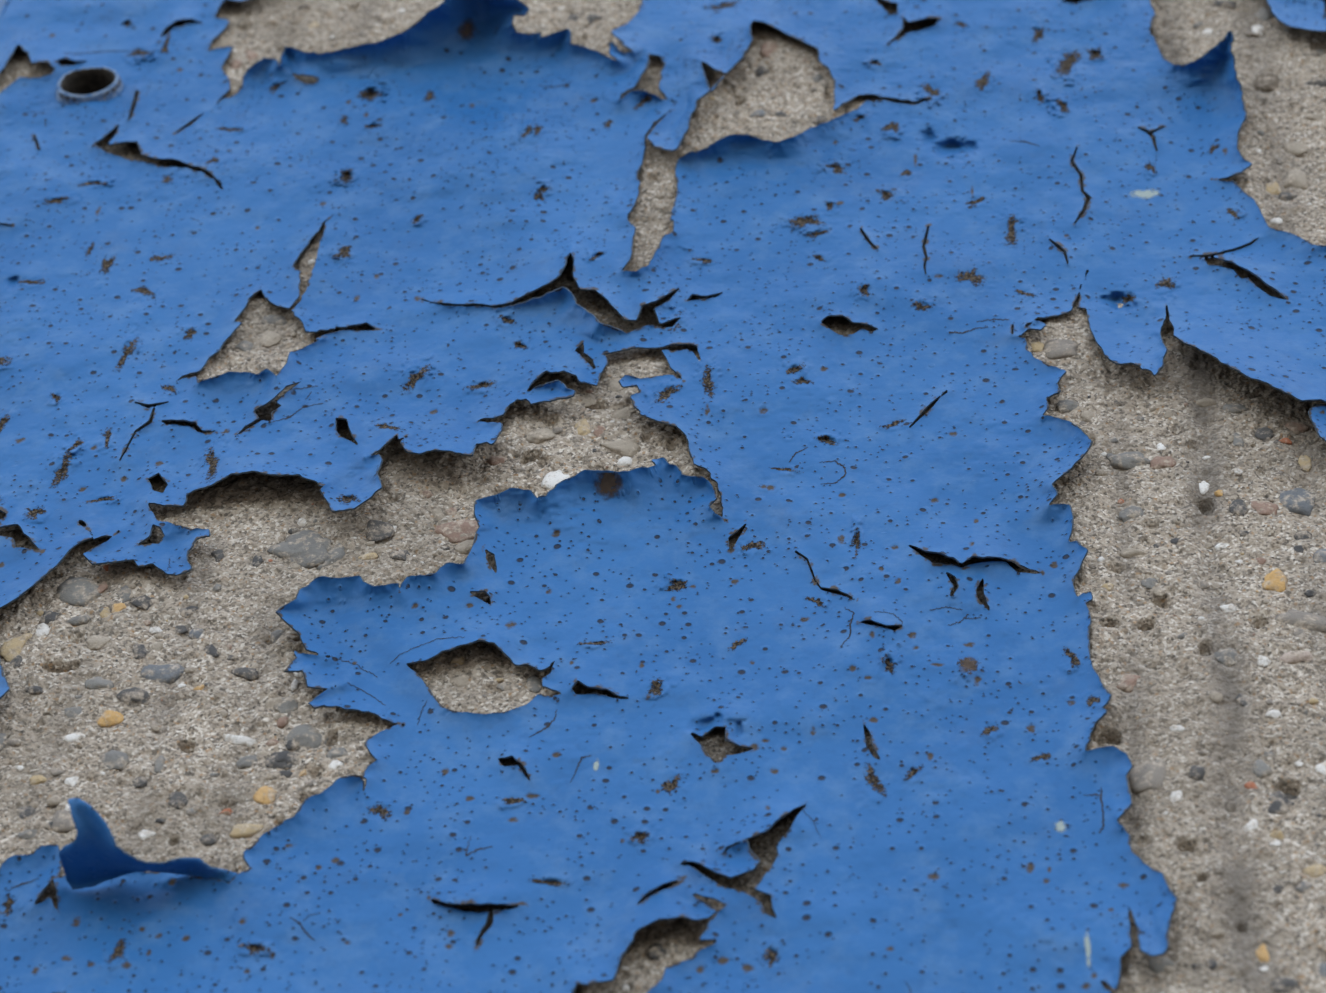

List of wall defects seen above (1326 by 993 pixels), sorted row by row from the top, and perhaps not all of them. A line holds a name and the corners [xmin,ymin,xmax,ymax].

peeling [209,0,944,271]
peeling [161,219,374,395]
crack [1190,239,1258,260]
peeling [0,314,724,889]
crack [795,552,980,647]
crack [1001,558,1042,573]
peeling [1012,0,1326,993]
peeling [574,895,725,993]